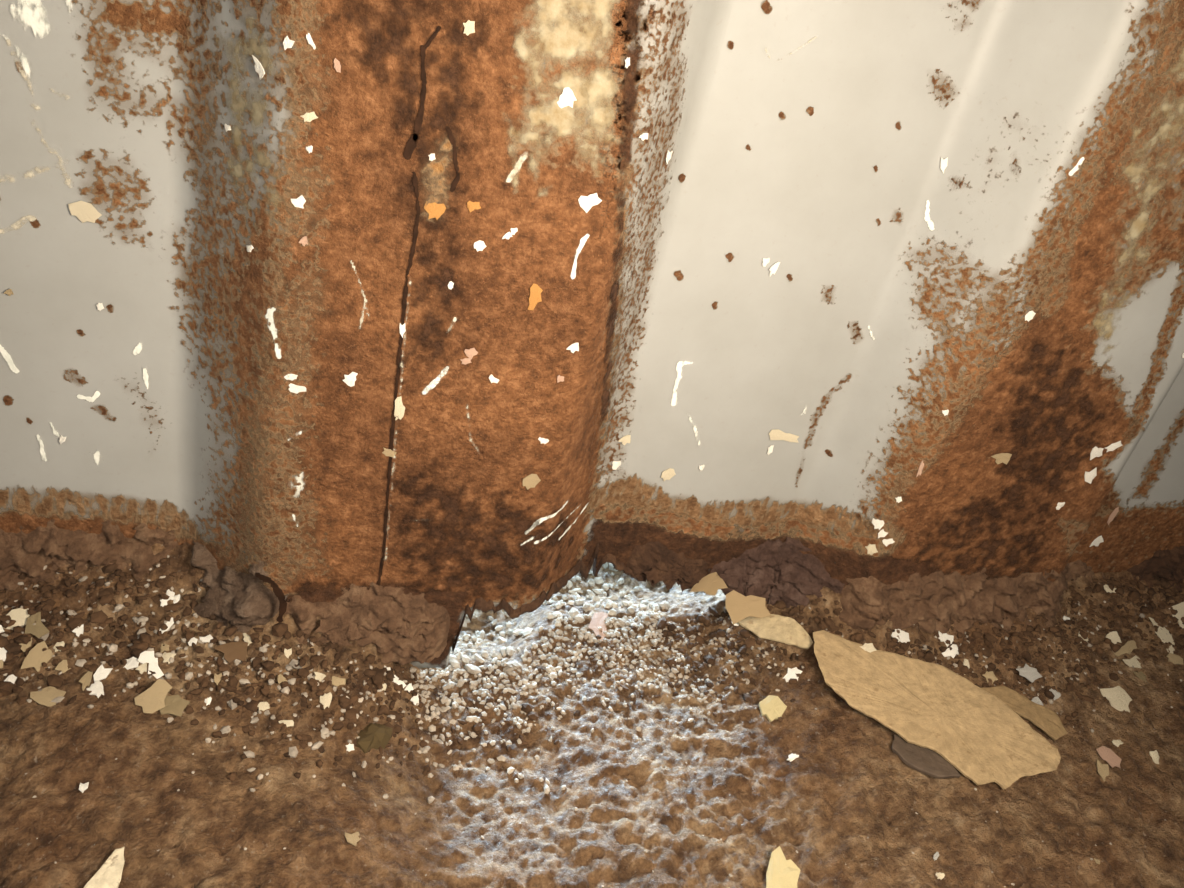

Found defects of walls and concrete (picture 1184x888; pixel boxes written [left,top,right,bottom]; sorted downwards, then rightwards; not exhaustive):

crack [376,26,460,586]
rust [0,0,1184,669]